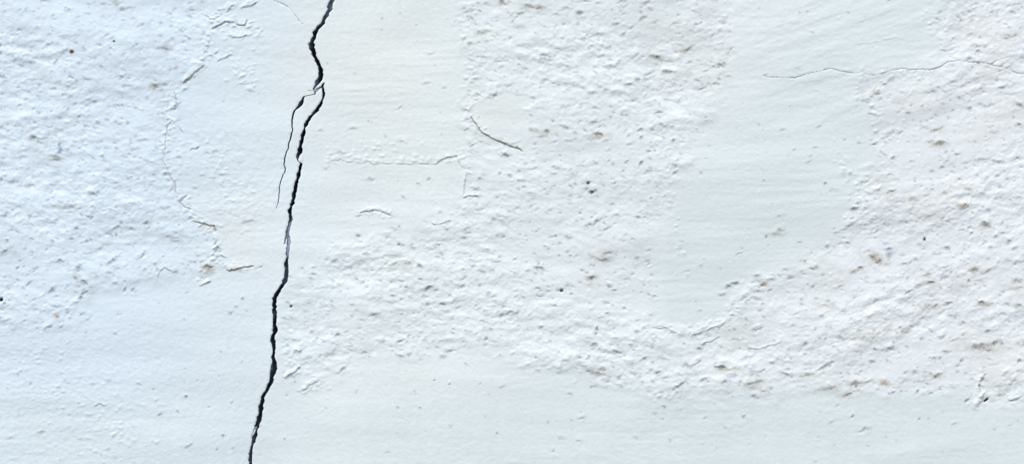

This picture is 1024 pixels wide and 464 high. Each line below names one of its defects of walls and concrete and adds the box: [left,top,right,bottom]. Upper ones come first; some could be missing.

crack [248,0,335,464]